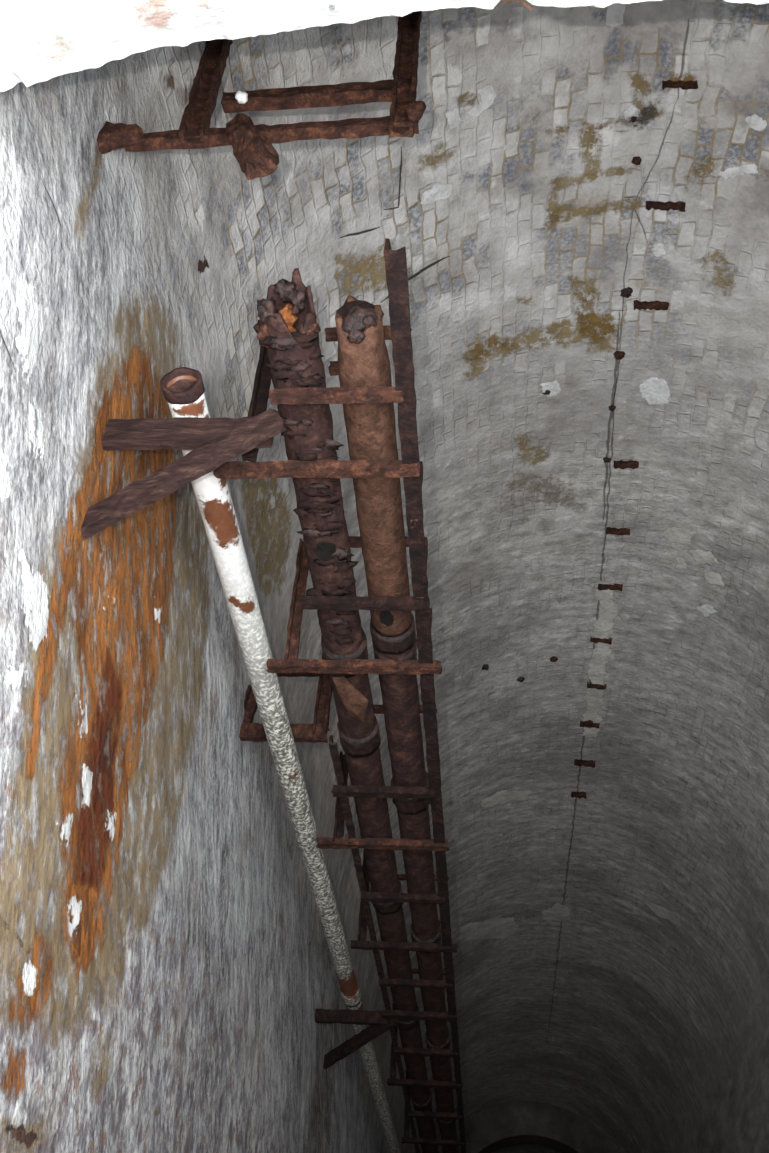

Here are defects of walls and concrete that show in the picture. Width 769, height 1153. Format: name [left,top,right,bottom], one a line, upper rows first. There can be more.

damp [547,75,662,231]
damp [464,276,615,377]
corrosion [0,298,208,1040]
corrosion [3,1046,27,1098]